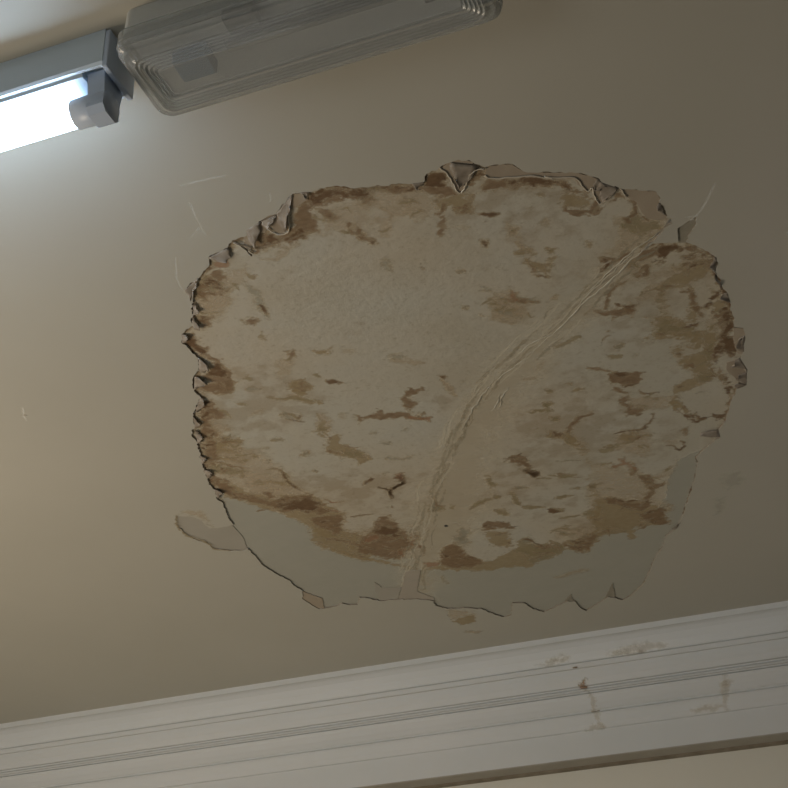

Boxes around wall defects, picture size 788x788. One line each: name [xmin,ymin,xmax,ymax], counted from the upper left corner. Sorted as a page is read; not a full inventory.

water stain [251,170,601,254]
water stain [183,237,671,572]
peeling [175,160,747,616]
crack [407,233,658,591]
water stain [598,192,737,451]